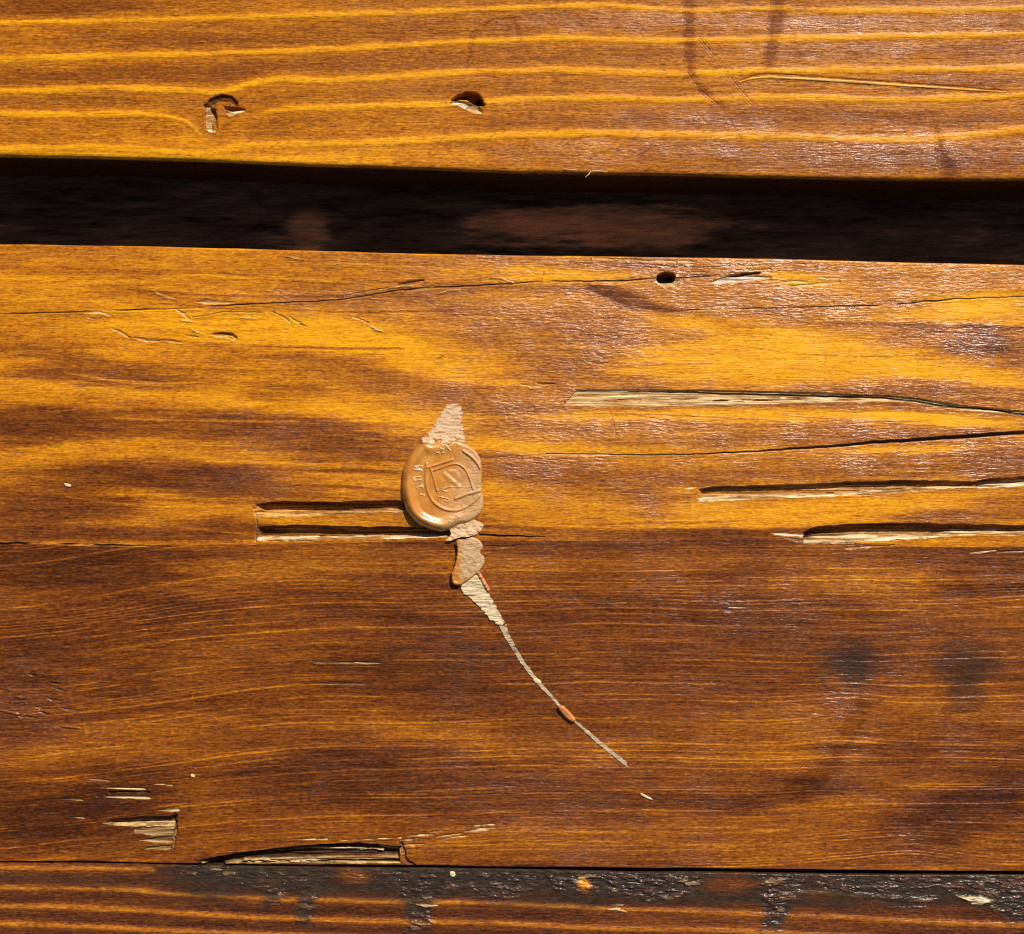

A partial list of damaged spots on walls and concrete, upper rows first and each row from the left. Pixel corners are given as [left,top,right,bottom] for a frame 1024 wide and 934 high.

crack [544,429,1024,458]
peeling [558,705,576,723]
spalling [59,777,182,853]
peeling [172,841,1024,934]